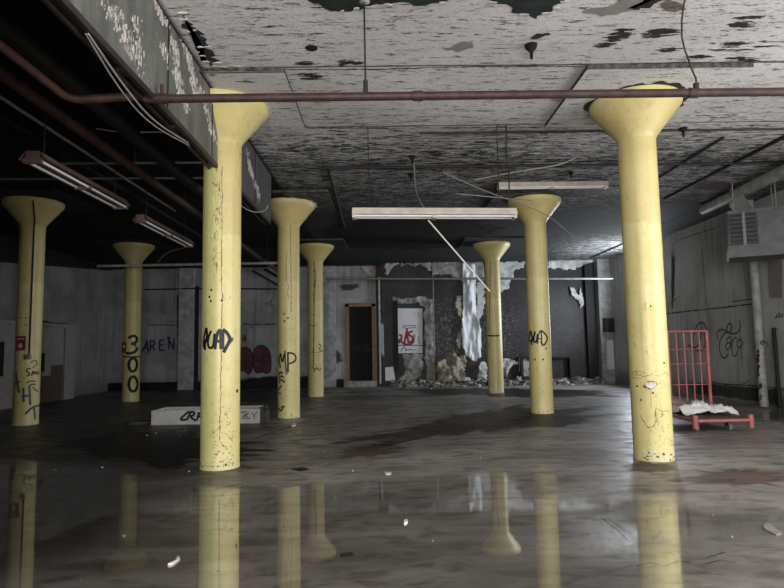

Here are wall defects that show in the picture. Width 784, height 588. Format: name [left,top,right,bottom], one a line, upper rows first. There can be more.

spalling [489,0,567,19]
peeling [582,0,662,17]
spalling [592,28,681,48]
spalling [153,0,246,145]
crack [631,371,669,428]